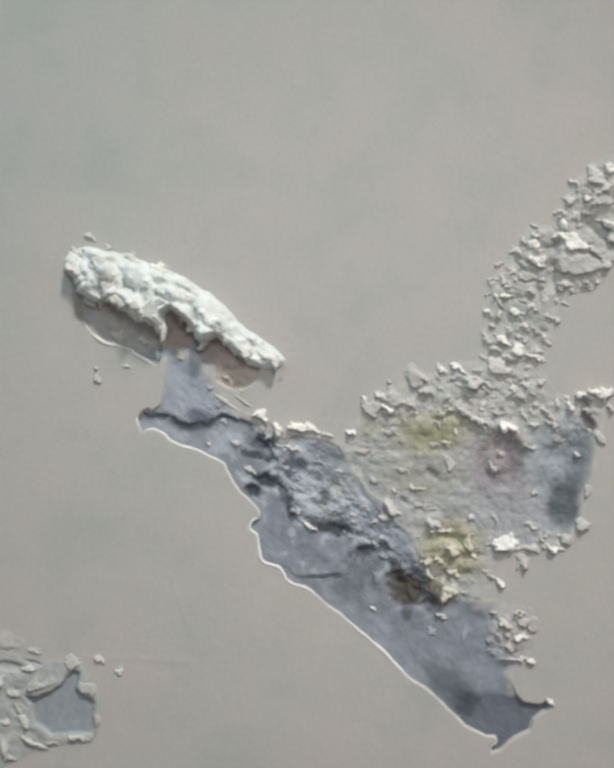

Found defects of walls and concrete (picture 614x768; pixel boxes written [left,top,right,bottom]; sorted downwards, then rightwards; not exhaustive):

spalling [0,629,101,768]
spalling [136,154,614,753]